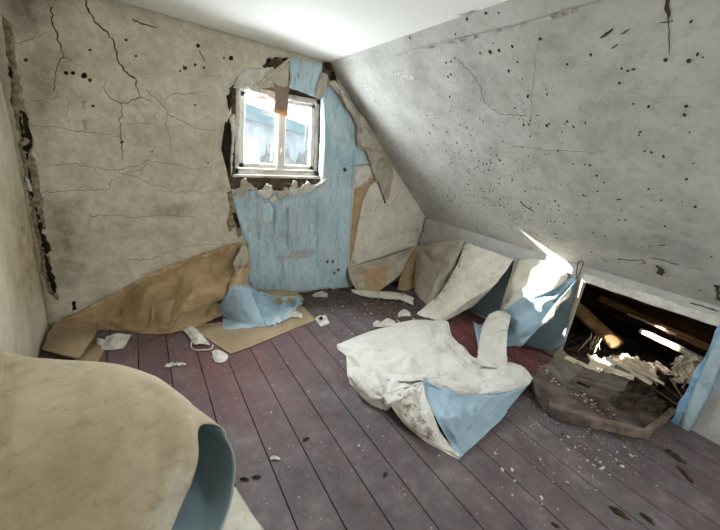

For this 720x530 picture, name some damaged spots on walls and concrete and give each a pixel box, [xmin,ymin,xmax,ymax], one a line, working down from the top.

crack [660,0,671,55]
crack [5,0,225,196]
flaking render [262,57,289,69]
flaking render [322,62,337,82]
flaking render [2,15,59,300]
flaking render [222,88,318,238]
flaking render [289,286,355,301]